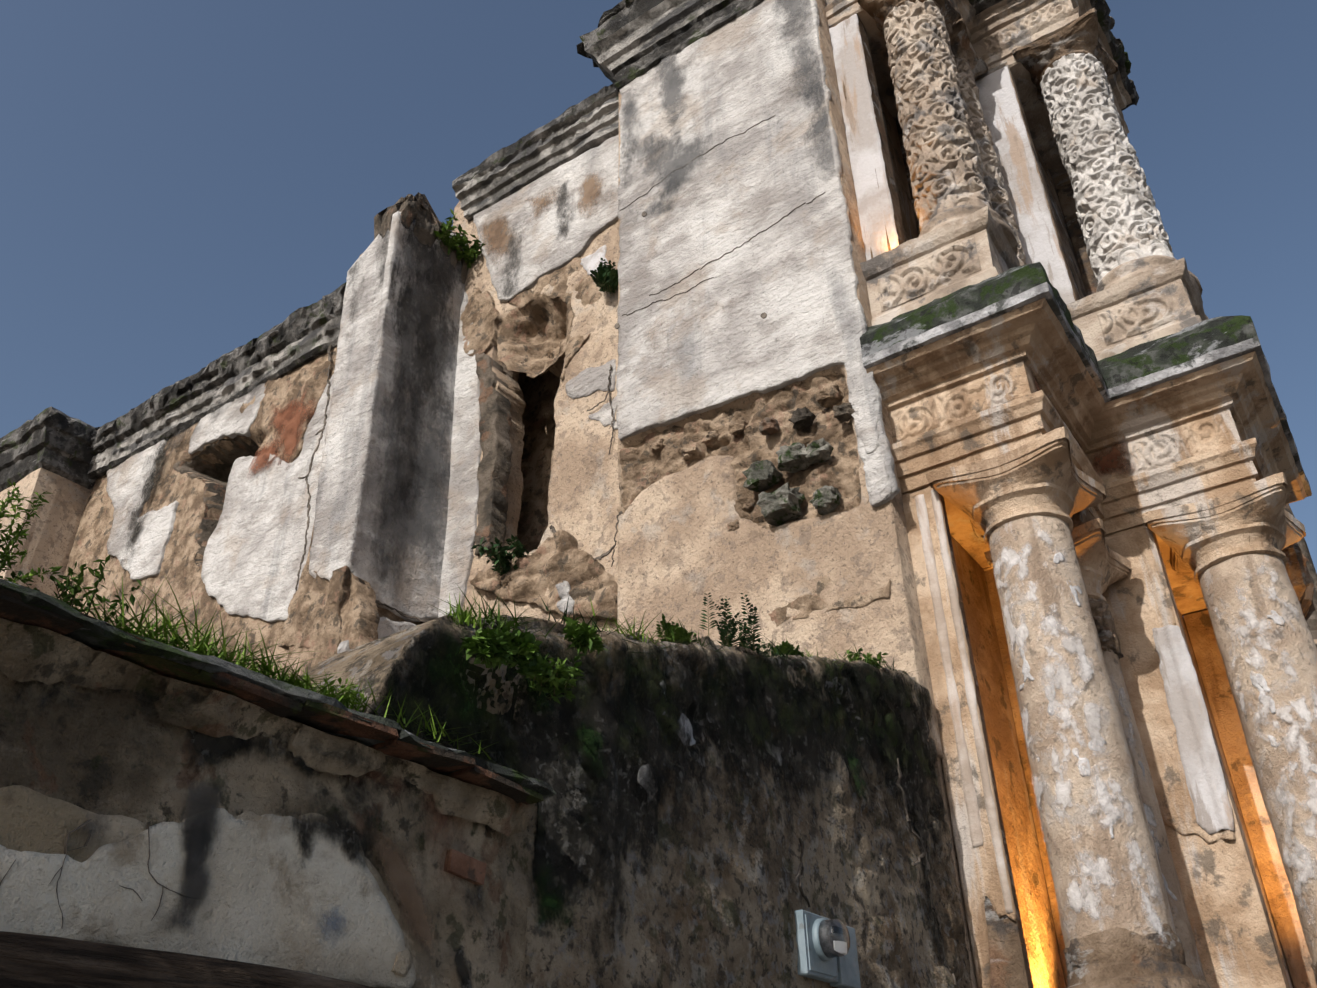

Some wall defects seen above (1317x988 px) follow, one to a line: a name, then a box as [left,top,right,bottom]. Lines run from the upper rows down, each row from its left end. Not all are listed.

damp [623,54,703,213]
crack [621,115,775,210]
crack [622,192,825,316]
flaking render [240,361,335,464]
crack [295,345,332,591]
damp [374,227,462,579]
flaking render [460,245,618,429]
flaking render [617,370,892,531]
flaking render [469,529,618,622]
crack [119,822,182,921]
damp [171,784,220,927]
damp [499,645,949,969]